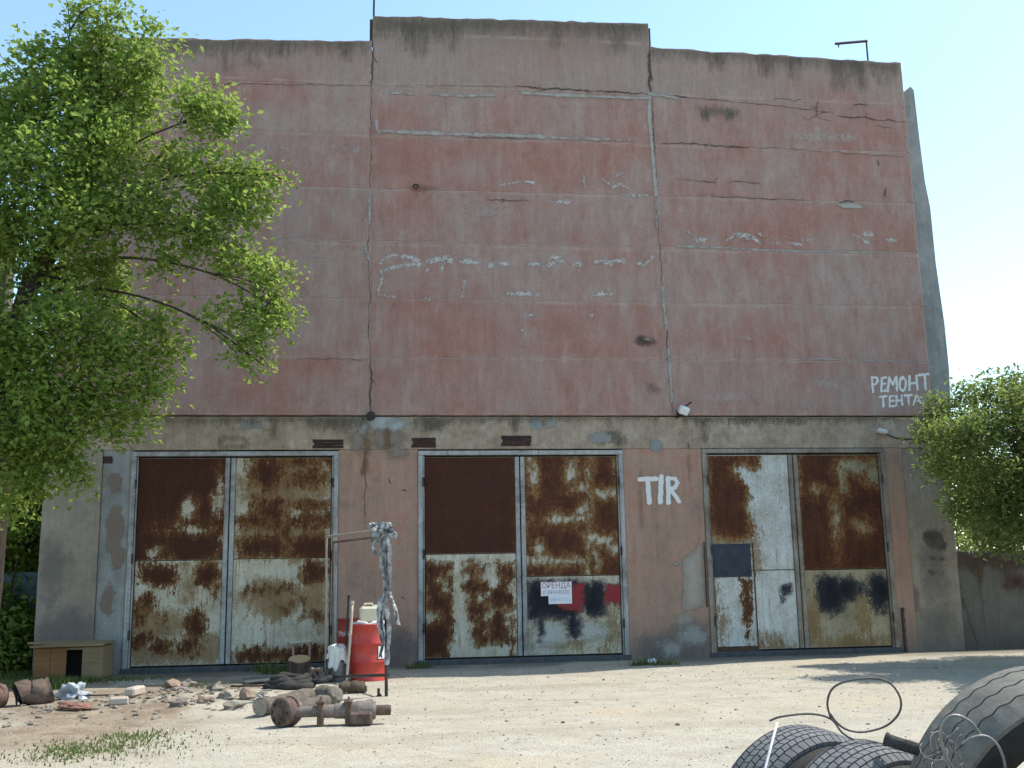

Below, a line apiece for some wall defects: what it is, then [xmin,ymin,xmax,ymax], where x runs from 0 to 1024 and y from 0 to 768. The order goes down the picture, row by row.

peeling [374,119,631,141]
peeling [364,245,510,298]
peeling [528,254,654,268]
crack [397,50,904,362]
peeling [678,229,897,254]
rust [131,458,332,666]
rust [425,457,621,658]
peeling [674,544,705,629]
rust [708,455,891,649]